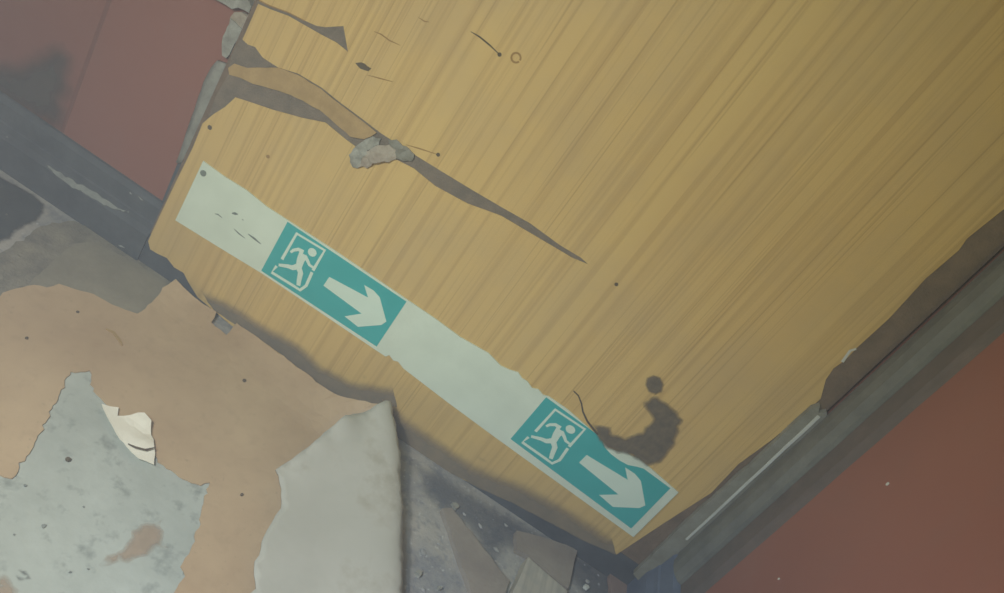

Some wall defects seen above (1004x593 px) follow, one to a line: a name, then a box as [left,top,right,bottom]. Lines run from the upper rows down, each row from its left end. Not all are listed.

spalling [229,37,278,68]
peeling [47,165,129,213]
peeling [0,371,209,593]